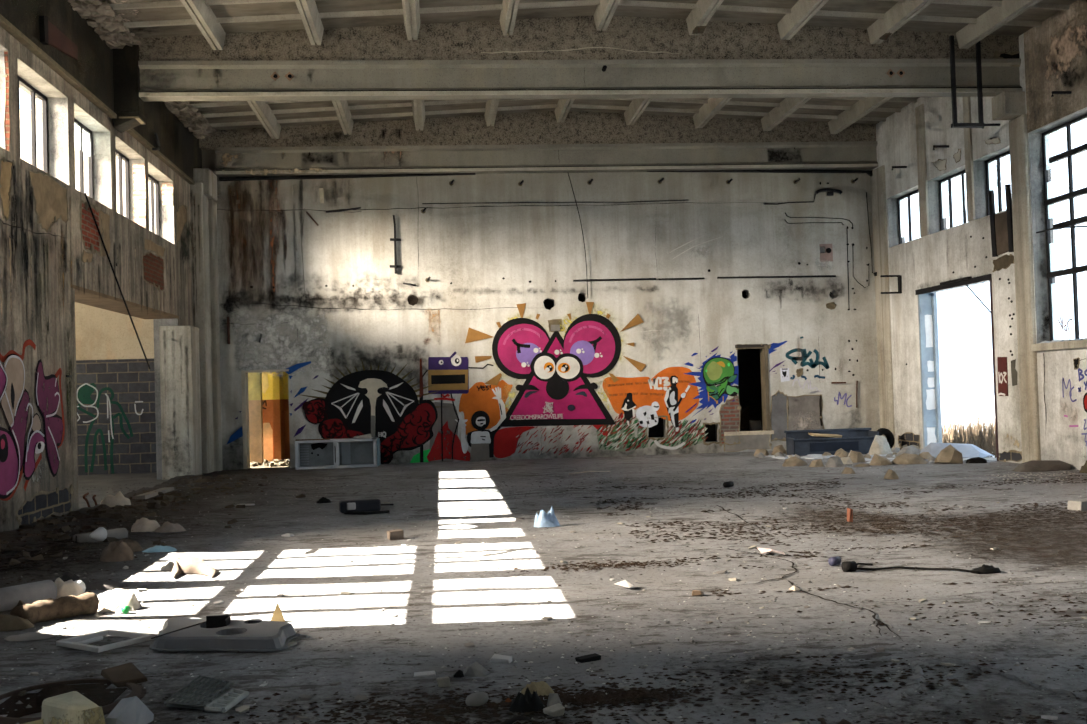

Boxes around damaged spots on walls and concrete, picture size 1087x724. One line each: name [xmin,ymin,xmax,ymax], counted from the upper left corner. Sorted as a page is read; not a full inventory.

spalling [68,0,142,49]
spalling [163,101,218,139]
flaking render [28,169,111,258]
leakage [0,164,100,317]
flaking render [142,251,164,291]
leakage [766,280,844,299]
crack [706,505,898,636]